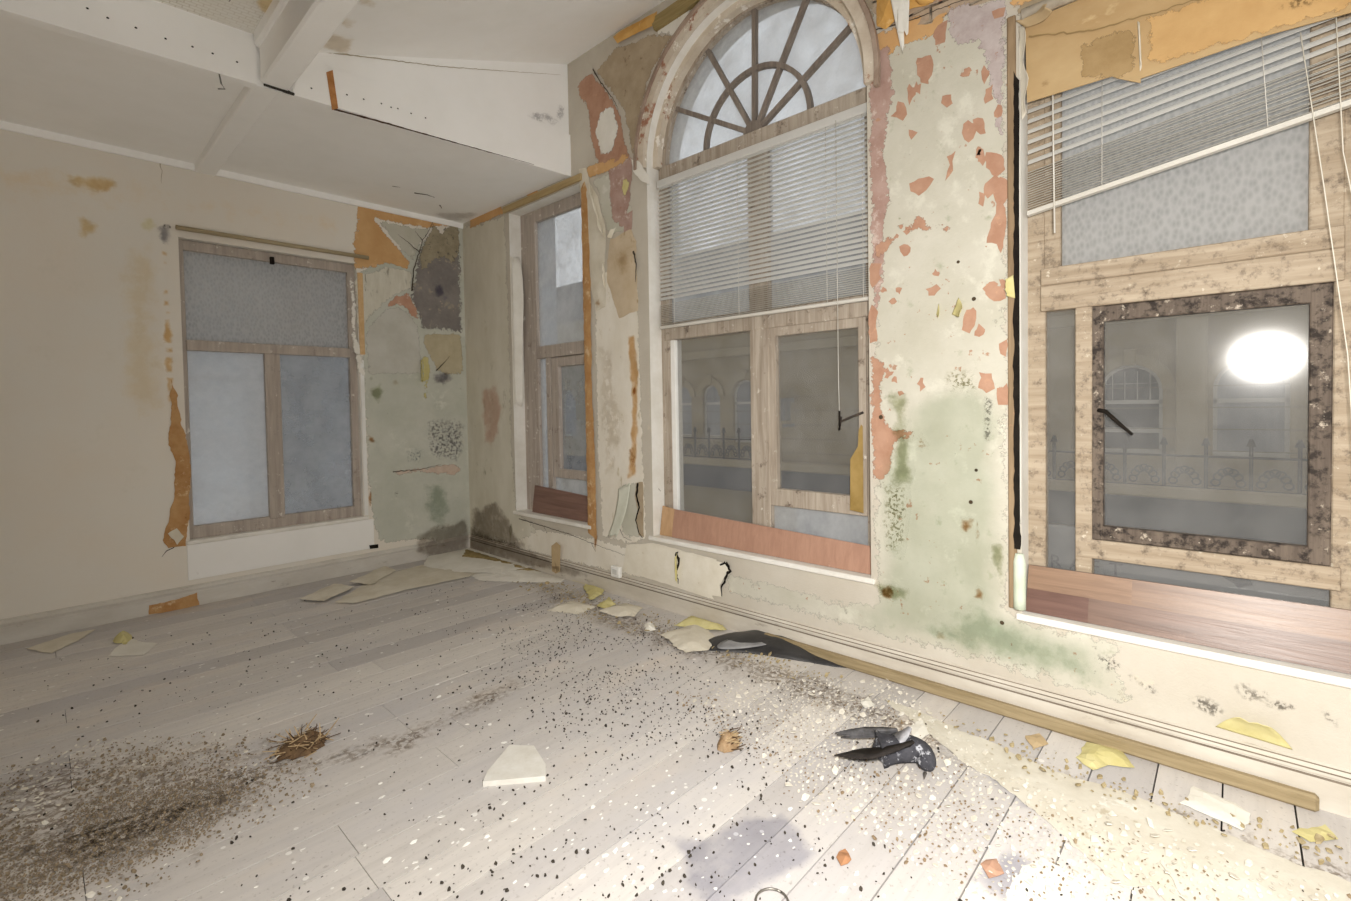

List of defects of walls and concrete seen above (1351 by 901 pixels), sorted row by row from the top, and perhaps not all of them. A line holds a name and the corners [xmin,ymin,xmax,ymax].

peeling [613,11,657,43]
flaking render [578,74,633,234]
flaking render [360,215,536,544]
flaking render [728,0,1132,703]
peeling [163,380,191,548]
flaking render [608,482,644,539]
crack [673,552,681,582]
crack [720,561,732,596]